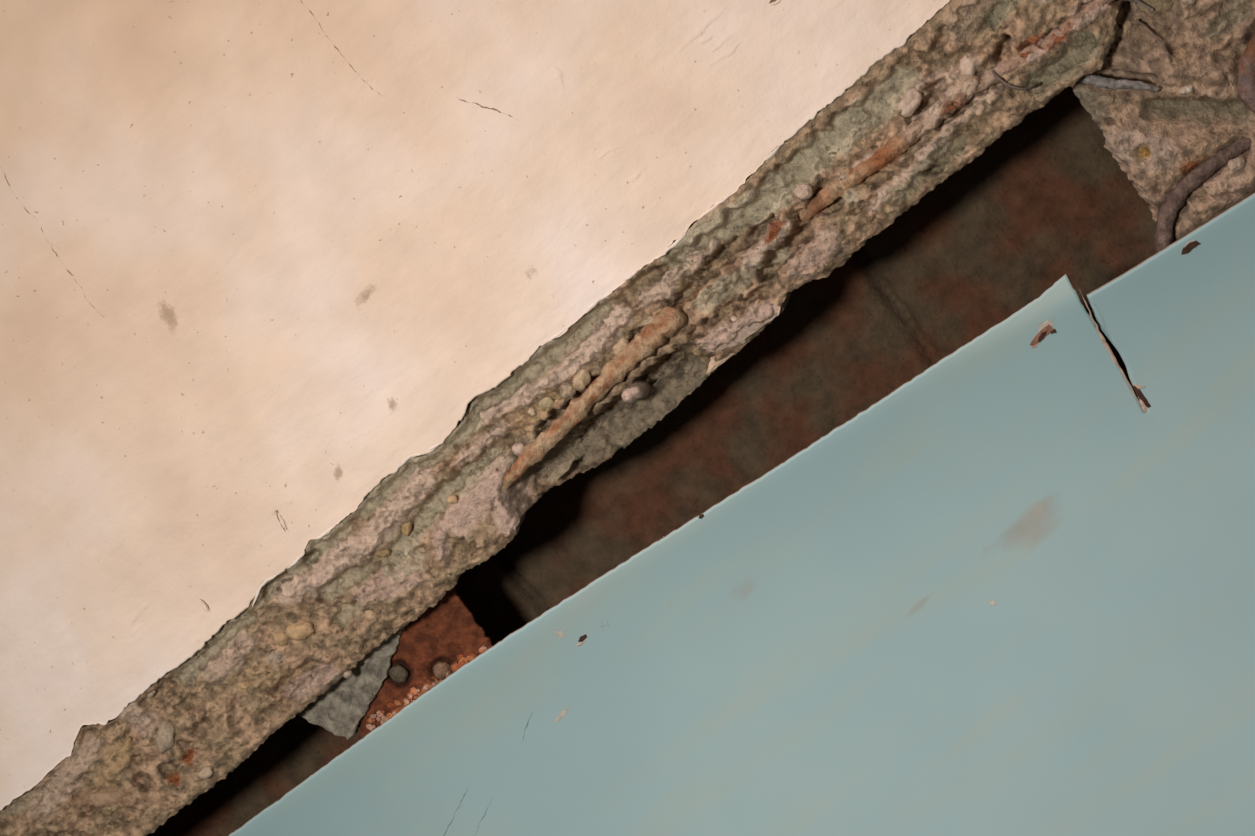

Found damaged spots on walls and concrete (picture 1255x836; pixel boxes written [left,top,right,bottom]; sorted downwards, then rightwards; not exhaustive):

spalling [966,55,1025,101]
spalling [896,87,922,118]
spalling [1072,0,1255,255]
spalling [797,117,925,221]
spalling [716,305,781,351]
spalling [706,353,735,374]
spalling [502,285,701,491]
spalling [273,632,289,647]
spalling [286,620,315,640]
spalling [155,721,176,754]
spalling [199,767,213,780]
spalling [90,789,119,807]